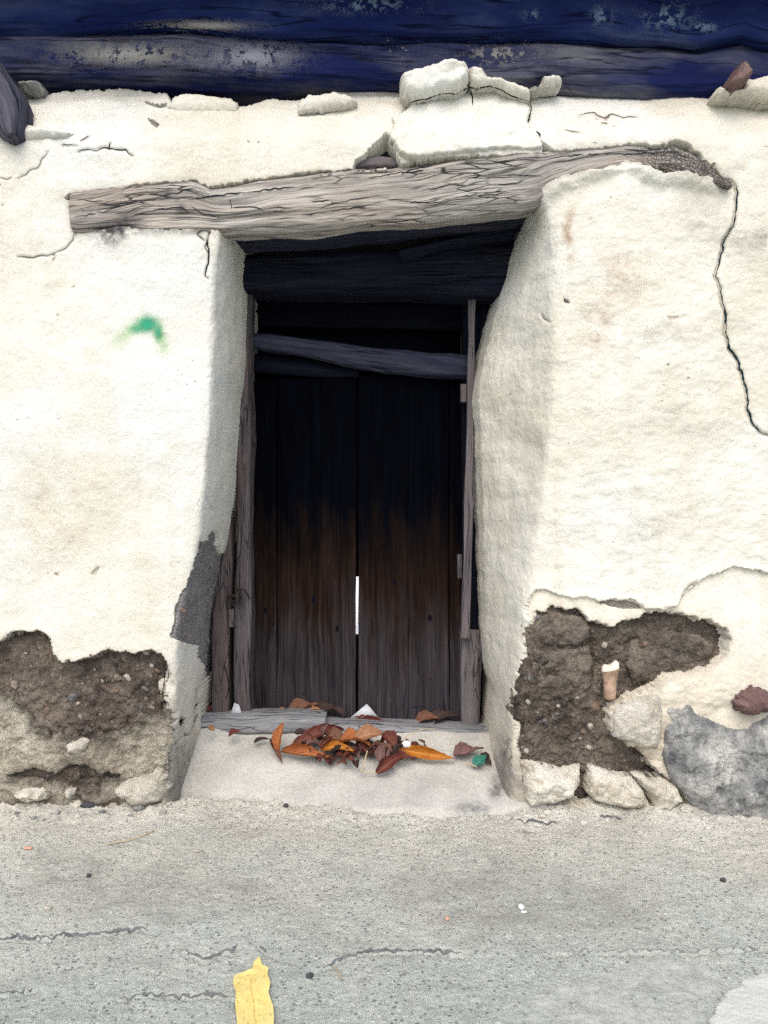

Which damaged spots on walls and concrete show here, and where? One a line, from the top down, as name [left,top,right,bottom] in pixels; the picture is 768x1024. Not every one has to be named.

crack [3,136,132,179]
crack [18,164,533,276]
crack [401,85,667,158]
crack [715,179,768,435]
flaking render [170,531,222,676]
flaking render [0,630,176,807]
flaking render [506,567,768,804]